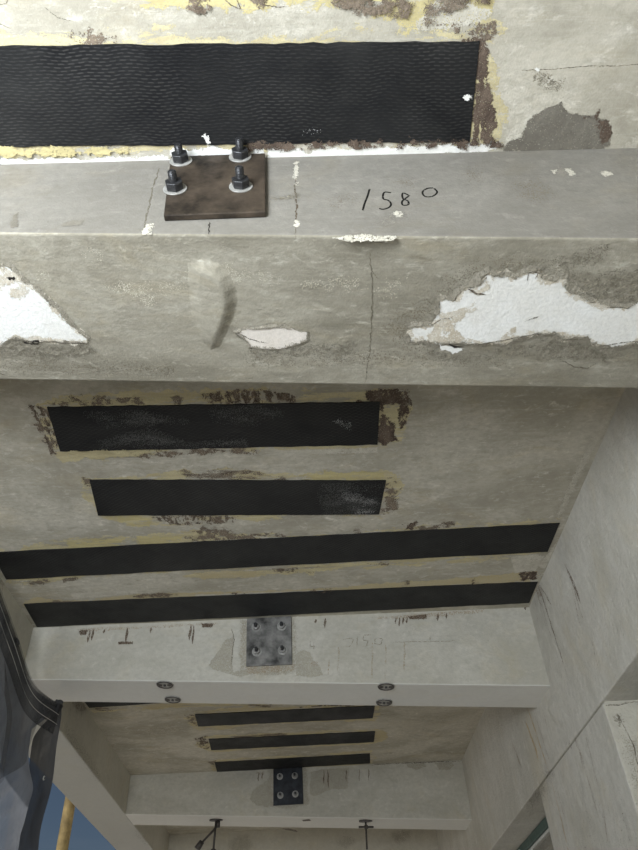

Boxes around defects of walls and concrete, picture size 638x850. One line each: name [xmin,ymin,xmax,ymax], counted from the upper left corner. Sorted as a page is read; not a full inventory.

leakage [0,0,613,160]
peeling [0,261,98,363]
peeling [231,323,357,360]
crack [366,252,378,376]
peeling [403,243,638,369]